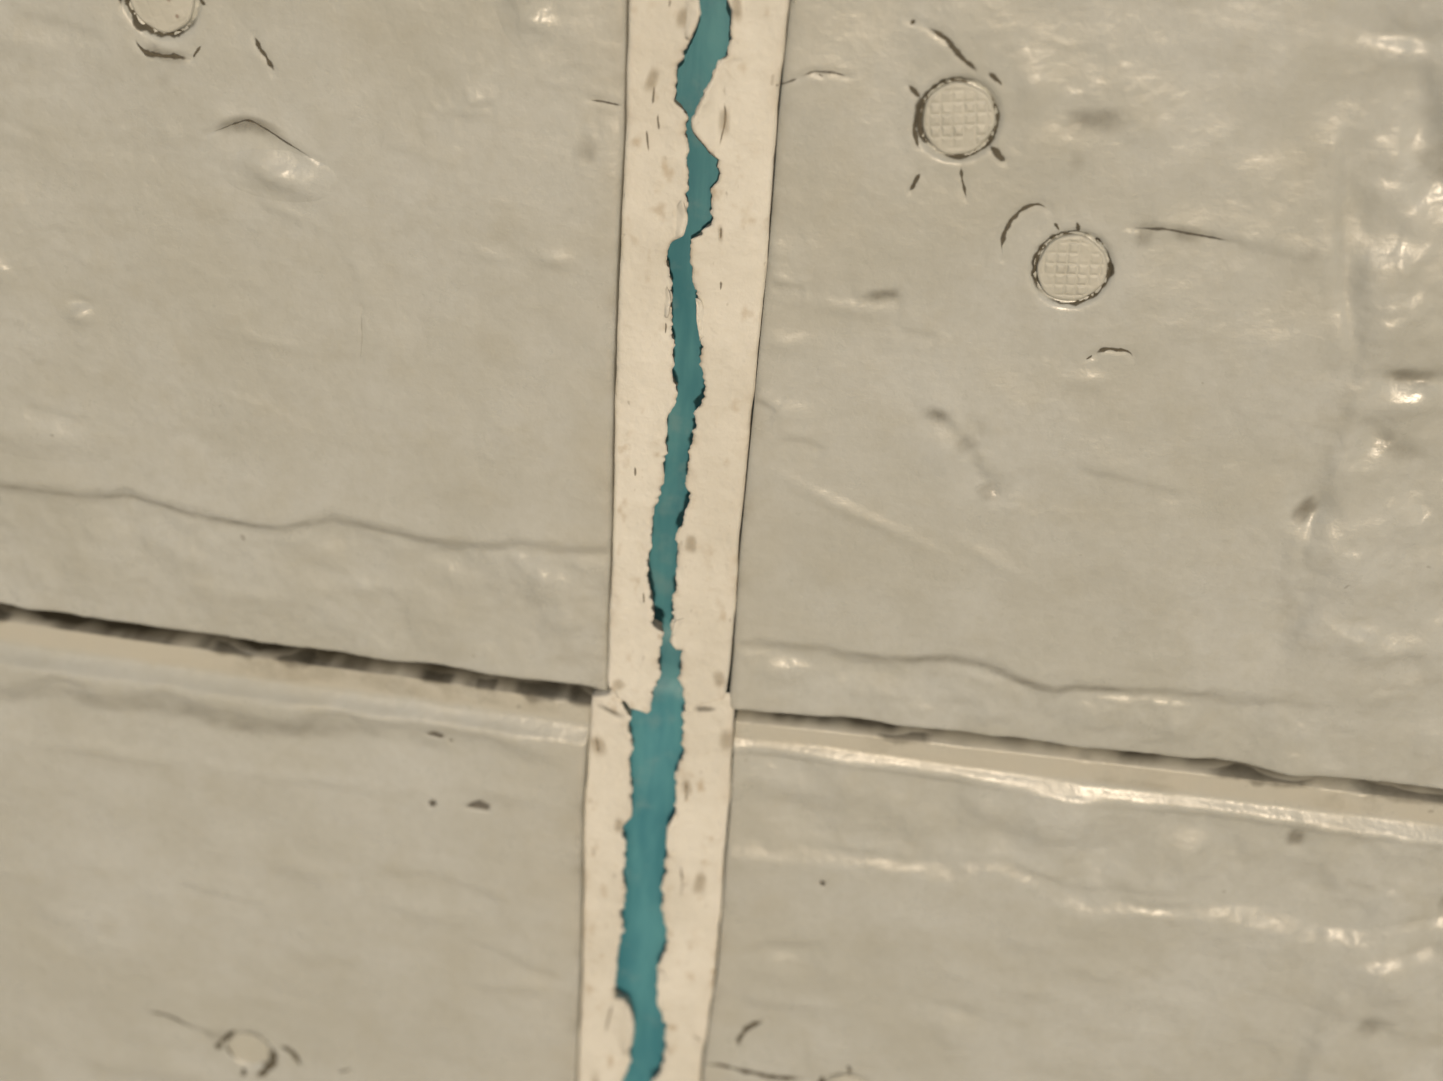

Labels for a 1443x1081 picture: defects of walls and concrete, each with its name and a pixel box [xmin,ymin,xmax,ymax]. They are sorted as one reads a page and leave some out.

crack [596,0,855,1081]